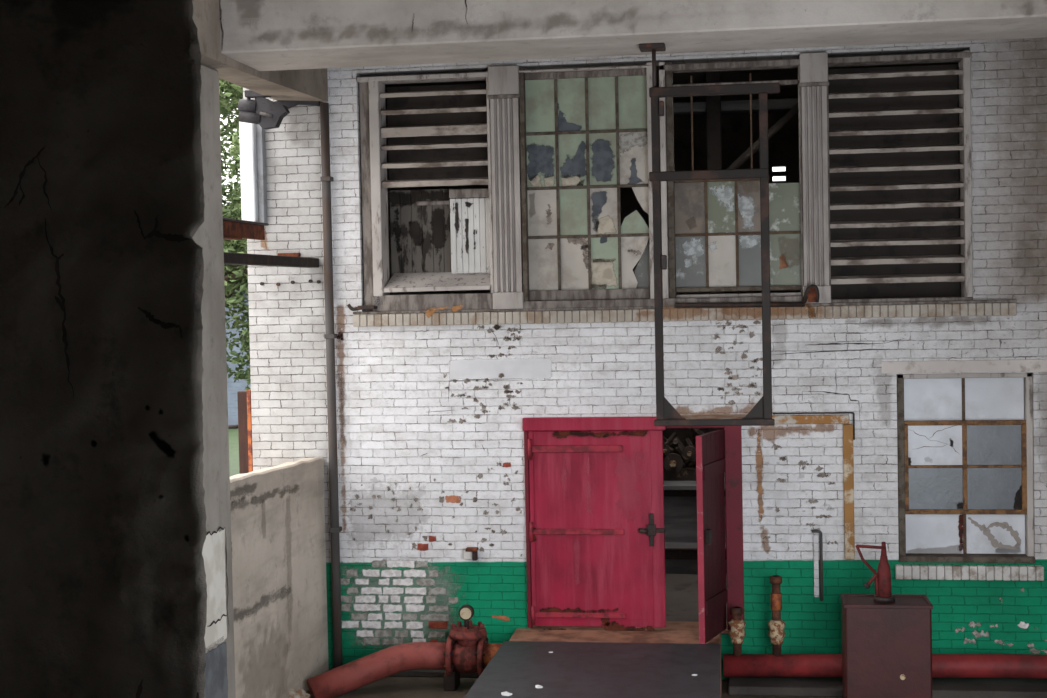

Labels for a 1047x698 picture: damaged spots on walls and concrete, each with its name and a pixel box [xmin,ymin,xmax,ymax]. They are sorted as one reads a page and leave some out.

crack [4,145,74,398]
rust [336,306,346,530]
peeling [444,373,523,424]
peeling [477,324,522,358]
peeling [713,320,763,405]
peeling [348,484,423,533]
rust [749,424,833,552]
peeling [340,527,458,645]
peeling [955,621,1014,647]